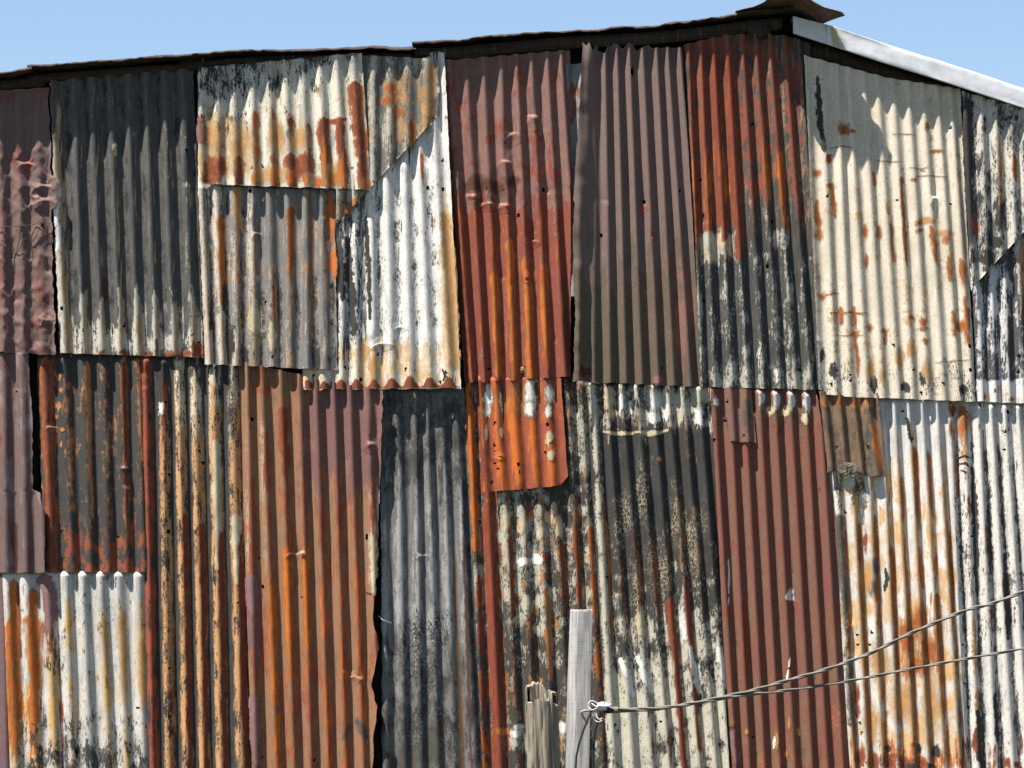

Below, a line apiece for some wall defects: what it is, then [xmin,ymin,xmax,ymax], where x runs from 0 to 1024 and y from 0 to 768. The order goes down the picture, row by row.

rust [202,80,371,305]
peeling [336,210,399,336]
rust [862,177,970,344]
peeling [601,385,671,437]
peeling [728,341,812,425]
rust [819,292,932,385]
rust [900,447,934,529]
peeling [500,508,565,567]
rust [182,513,313,768]
peeling [677,605,701,695]
rust [854,514,944,768]
leakage [391,716,440,768]